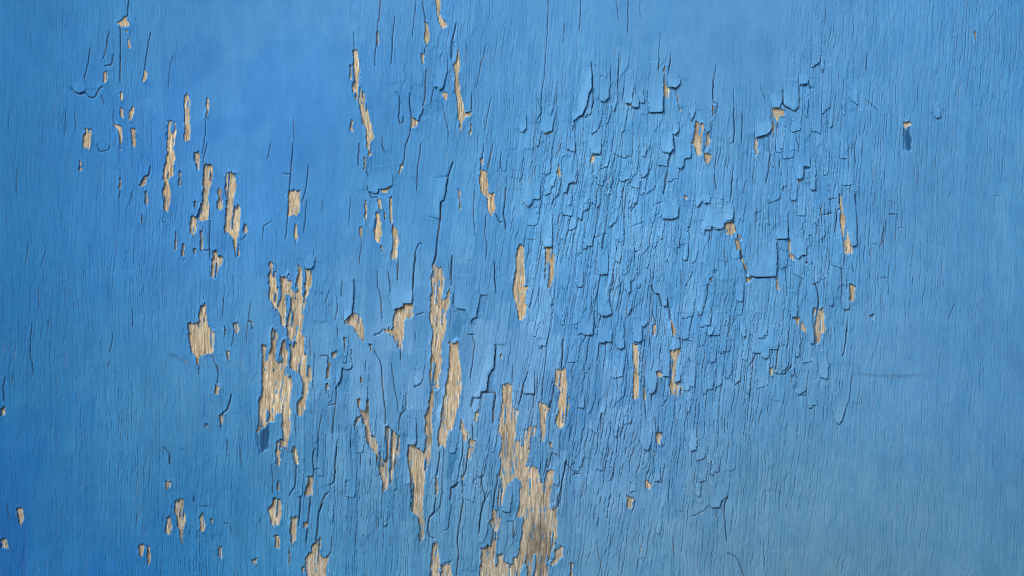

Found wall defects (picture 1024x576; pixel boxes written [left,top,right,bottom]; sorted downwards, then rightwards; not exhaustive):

peeling [139,93,248,278]
peeling [188,300,253,368]
peeling [256,190,314,498]
peeling [349,47,376,171]
crack [272,164,454,556]
crack [349,49,449,219]
peeling [326,264,585,576]
crack [451,27,524,289]
crack [411,334,579,569]
peeling [511,20,857,510]
crack [712,70,743,144]
crack [709,220,854,305]